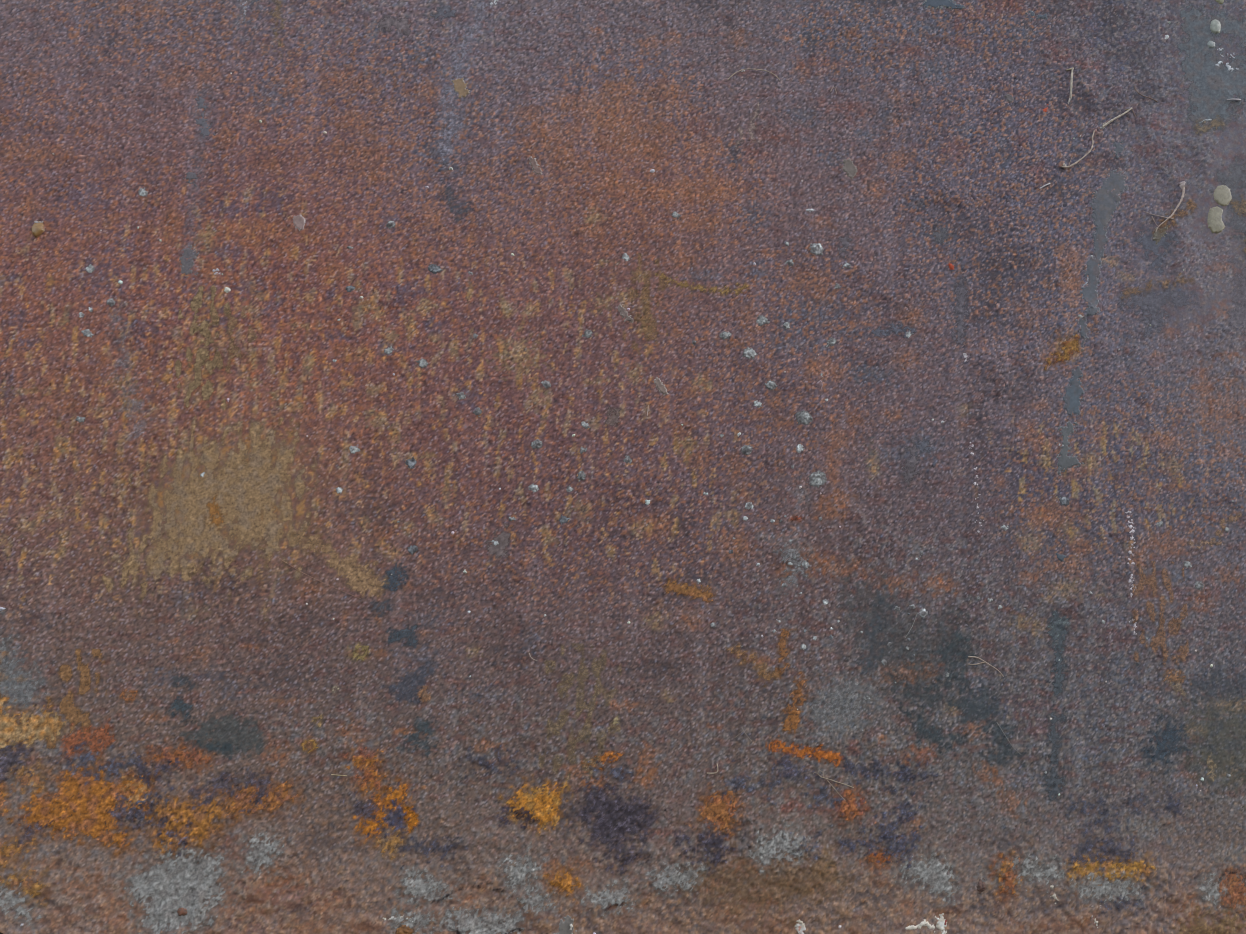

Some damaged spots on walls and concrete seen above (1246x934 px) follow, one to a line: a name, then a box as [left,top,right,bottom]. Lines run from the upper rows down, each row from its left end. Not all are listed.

peeling [1177,2,1246,132]
peeling [1212,157,1246,240]
corrosion [181,457,192,482]
corrosion [220,524,244,551]